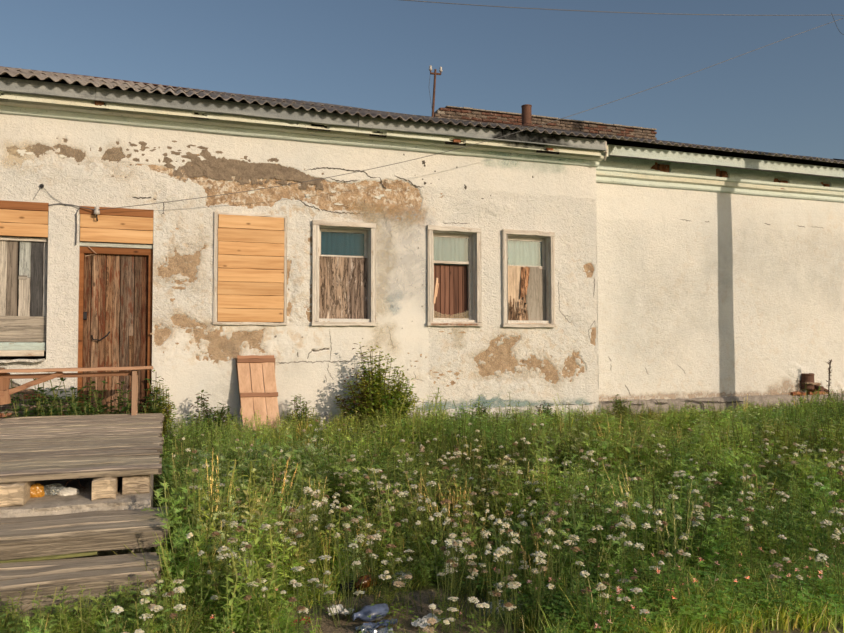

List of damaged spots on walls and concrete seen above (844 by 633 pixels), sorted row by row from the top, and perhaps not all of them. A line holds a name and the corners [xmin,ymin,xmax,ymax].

flaking render [6,138,432,218]
flaking render [157,245,206,302]
flaking render [583,263,594,278]
flaking render [150,312,266,363]
flaking render [474,333,585,384]
flaking render [0,380,74,419]